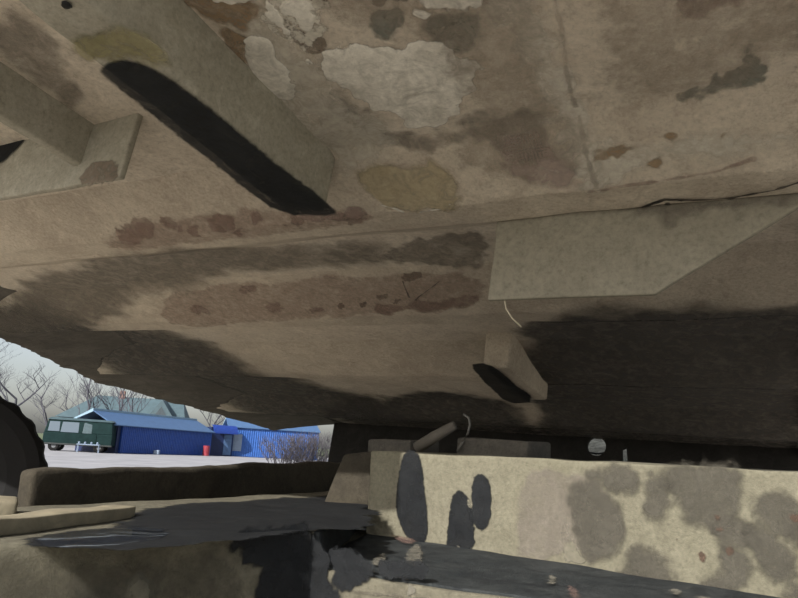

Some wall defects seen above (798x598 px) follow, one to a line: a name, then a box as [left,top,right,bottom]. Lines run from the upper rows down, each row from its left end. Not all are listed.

damp [370,8,404,40]
damp [424,14,479,53]
peeling [243,0,485,128]
damp [680,44,767,101]
crack [642,182,798,208]
damp [321,234,487,268]
damp [0,247,309,333]
damp [60,307,798,598]